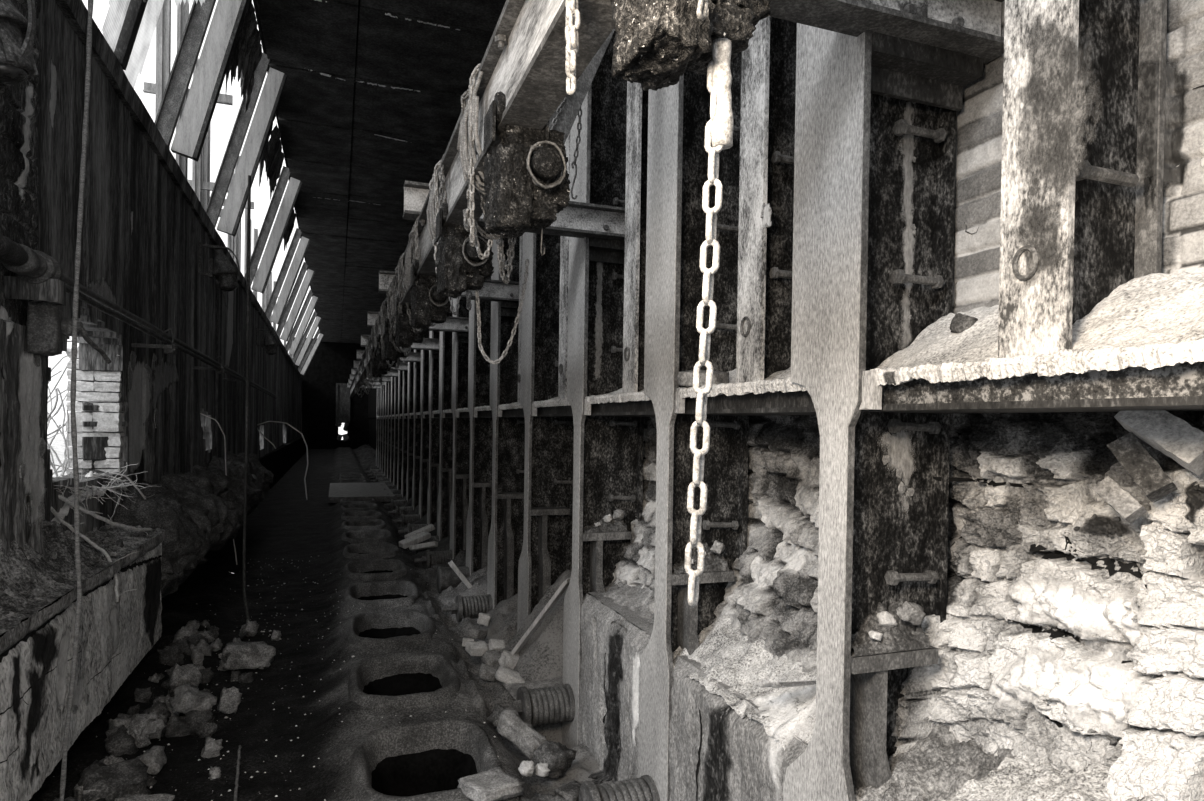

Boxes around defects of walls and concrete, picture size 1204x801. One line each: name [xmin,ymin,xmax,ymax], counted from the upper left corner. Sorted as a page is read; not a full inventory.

damp [144,558,162,648]
damp [12,625,70,785]
crack [601,652,609,745]
crack [695,710,703,801]